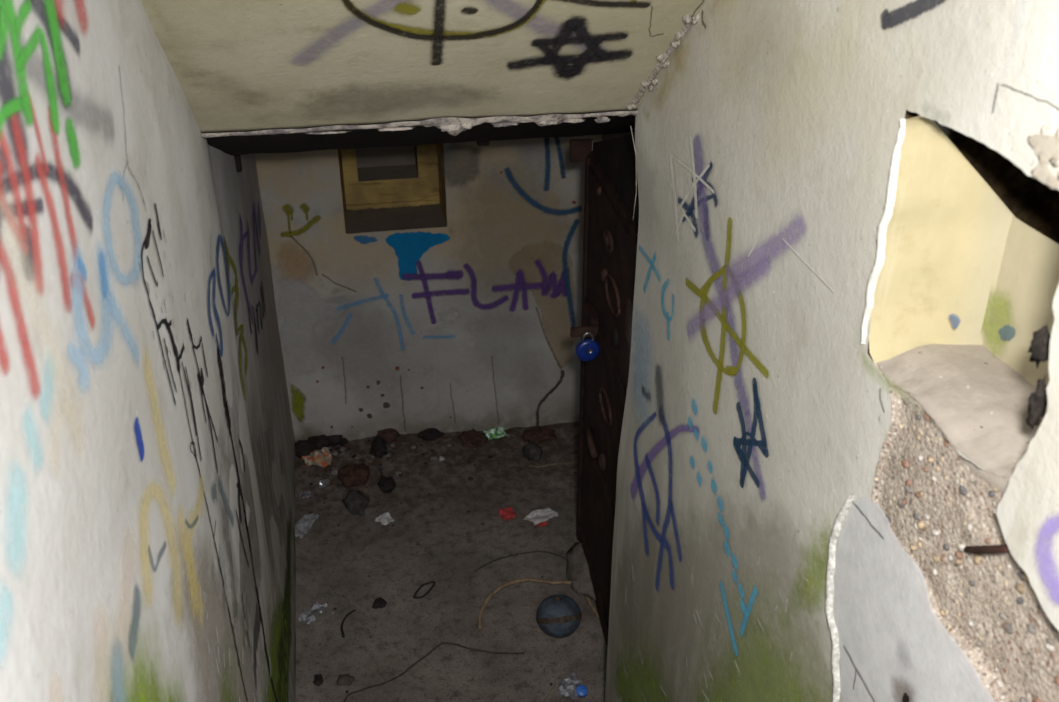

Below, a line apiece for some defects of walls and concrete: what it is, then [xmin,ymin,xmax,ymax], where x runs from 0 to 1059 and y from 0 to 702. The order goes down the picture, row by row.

spalling [201,14,699,138]
crack [992,83,1059,113]
spalling [860,110,920,344]
spalling [933,120,1059,244]
spalling [1026,325,1051,430]
spalling [825,385,1059,702]